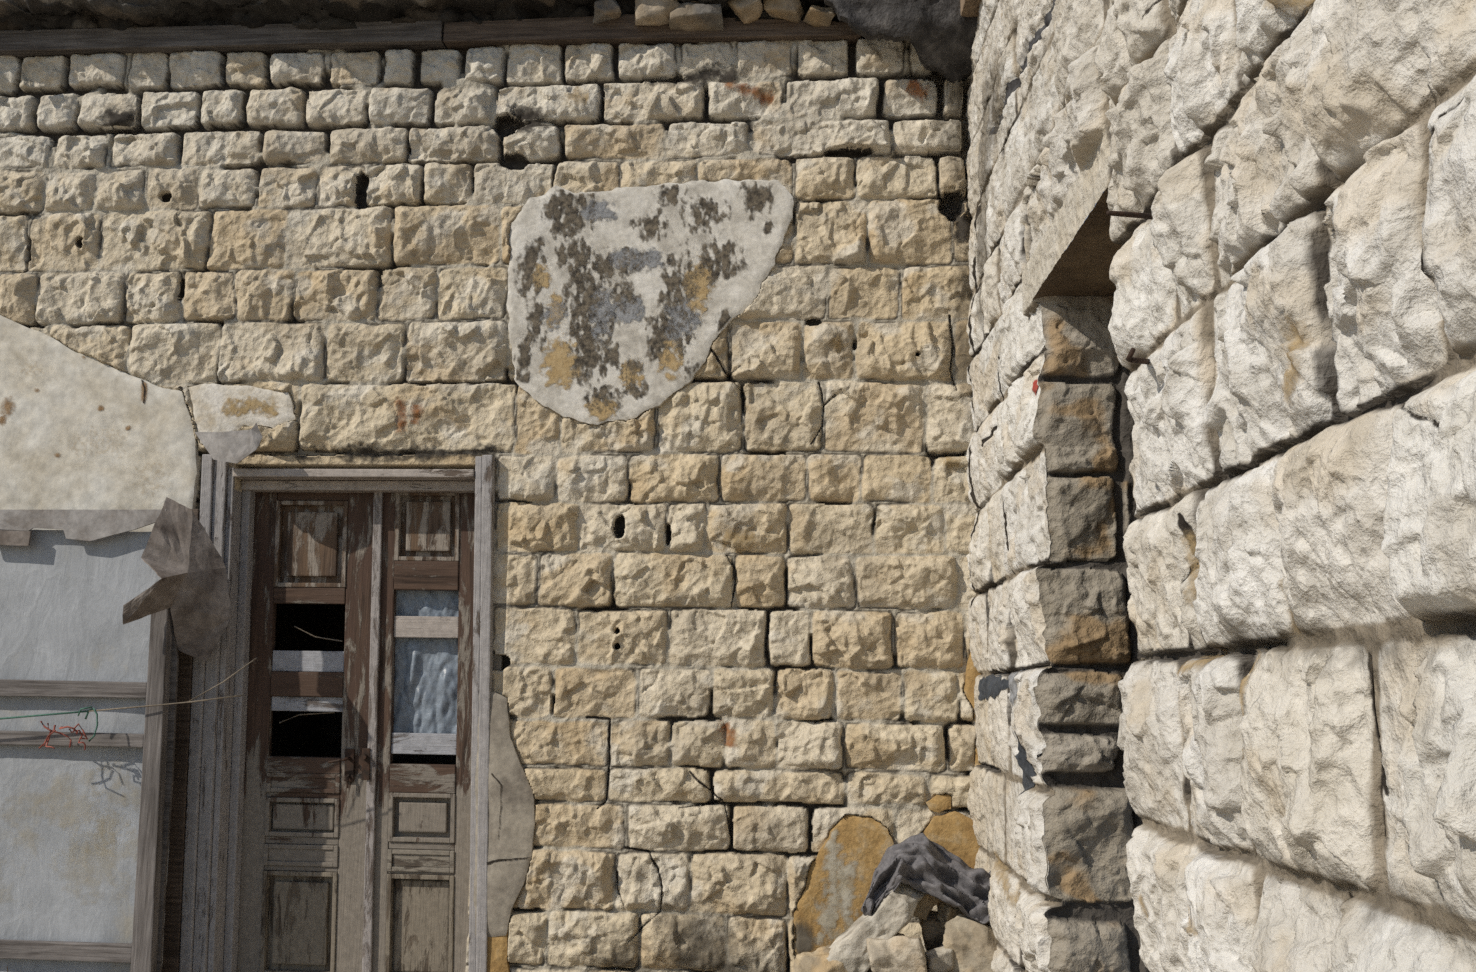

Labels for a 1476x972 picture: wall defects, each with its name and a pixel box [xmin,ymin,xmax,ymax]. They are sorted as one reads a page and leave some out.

damp [513,181,773,412]
crack [616,846,663,942]